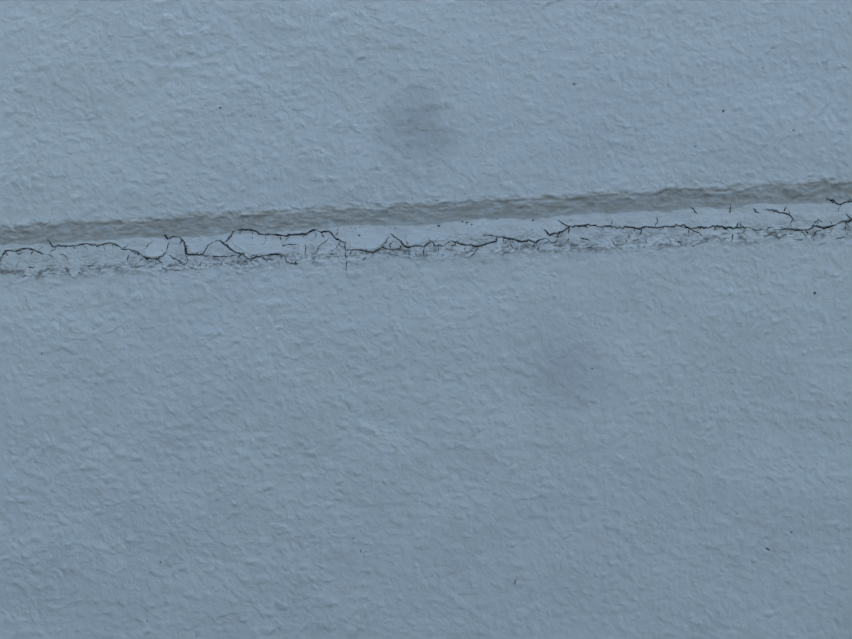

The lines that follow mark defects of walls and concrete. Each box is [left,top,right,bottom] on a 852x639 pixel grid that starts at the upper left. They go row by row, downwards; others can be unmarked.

crack [0,199,852,277]